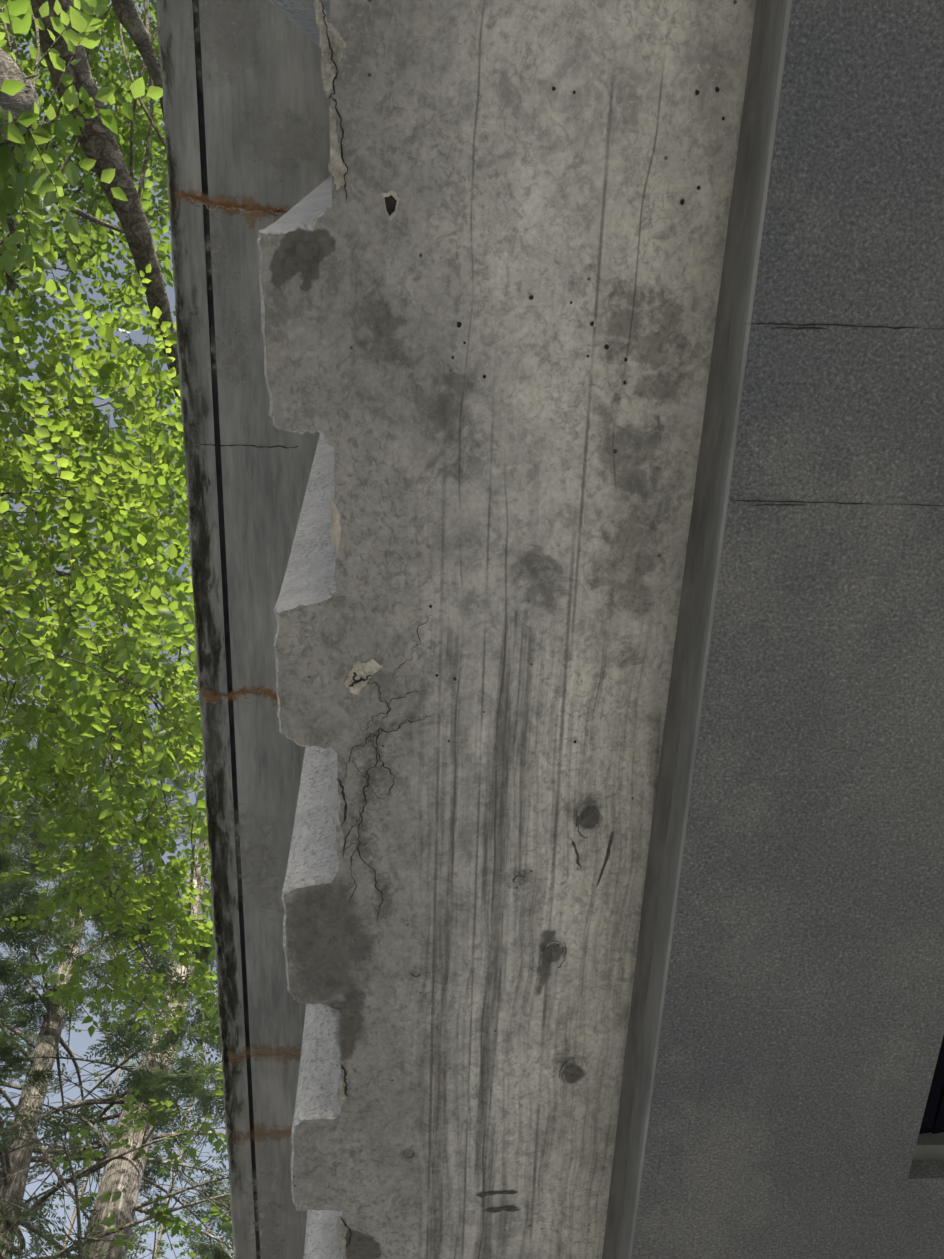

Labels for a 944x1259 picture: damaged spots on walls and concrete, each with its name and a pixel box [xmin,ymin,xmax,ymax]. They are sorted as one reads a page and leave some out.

crack [341,615,438,922]
spalling [335,778,347,865]
leakage [476,1191,521,1213]